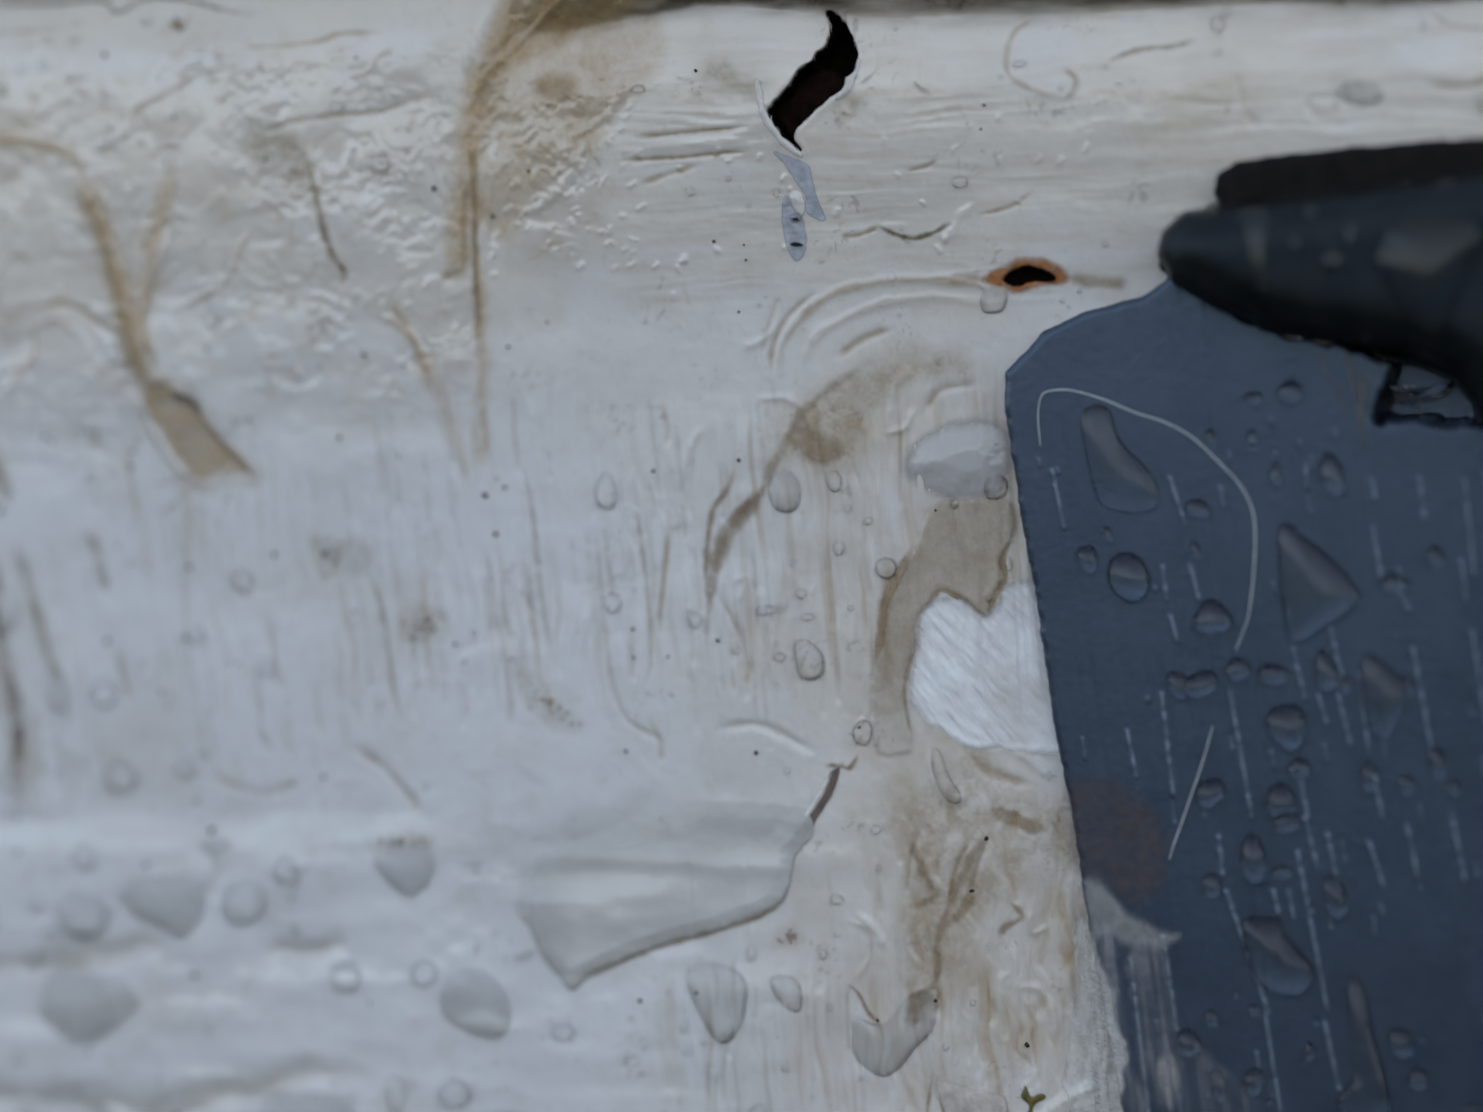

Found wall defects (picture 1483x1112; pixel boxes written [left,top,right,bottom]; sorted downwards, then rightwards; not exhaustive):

corrosion [985,259,1067,291]
damp [704,496,725,573]
peeling [875,498,1059,753]